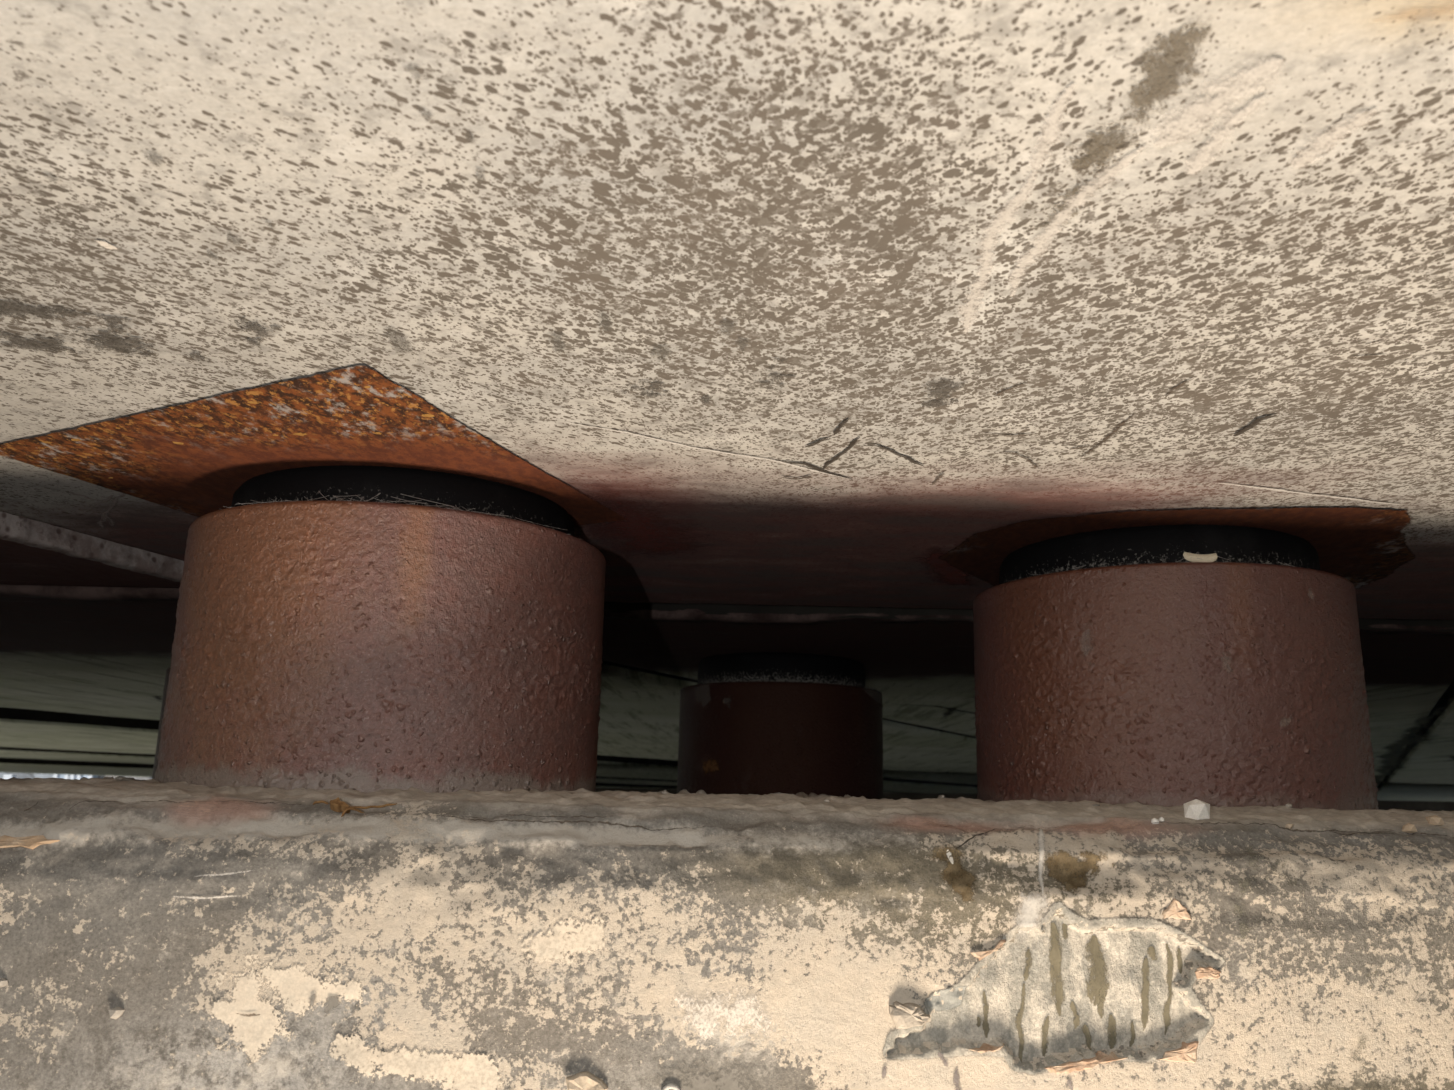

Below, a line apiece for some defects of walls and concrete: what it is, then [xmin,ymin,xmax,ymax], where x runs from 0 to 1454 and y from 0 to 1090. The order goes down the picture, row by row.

water stain [1292,109,1376,169]
water stain [1009,58,1284,297]
water stain [0,298,154,357]
water stain [232,318,281,346]
water stain [618,379,669,399]
water stain [755,357,795,391]
water stain [921,379,967,408]
spalling [883,898,1225,1075]